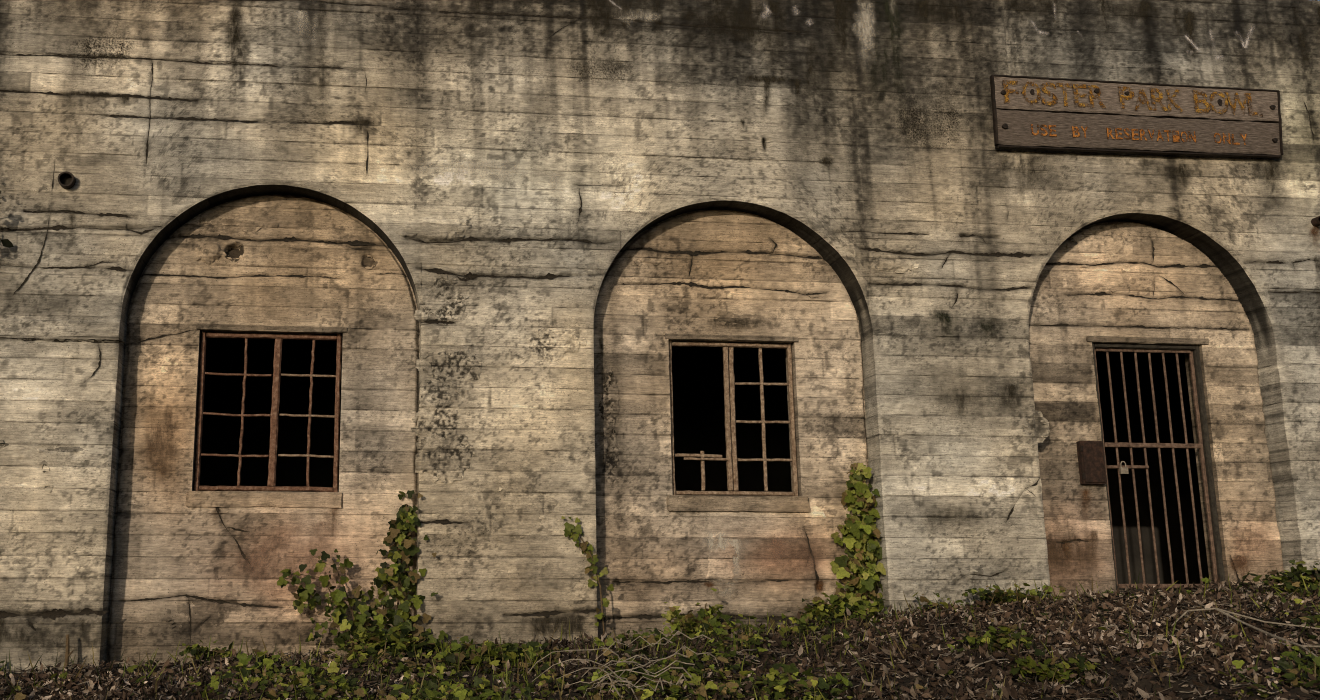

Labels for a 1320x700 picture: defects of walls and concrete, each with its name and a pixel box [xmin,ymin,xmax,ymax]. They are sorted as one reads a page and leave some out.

leakage [77,36,133,67]
leakage [229,0,245,69]
leakage [67,91,129,104]
crack [0,54,367,163]
leakage [748,63,812,108]
crack [298,121,369,176]
crack [1006,478,1040,522]
crack [216,507,251,565]